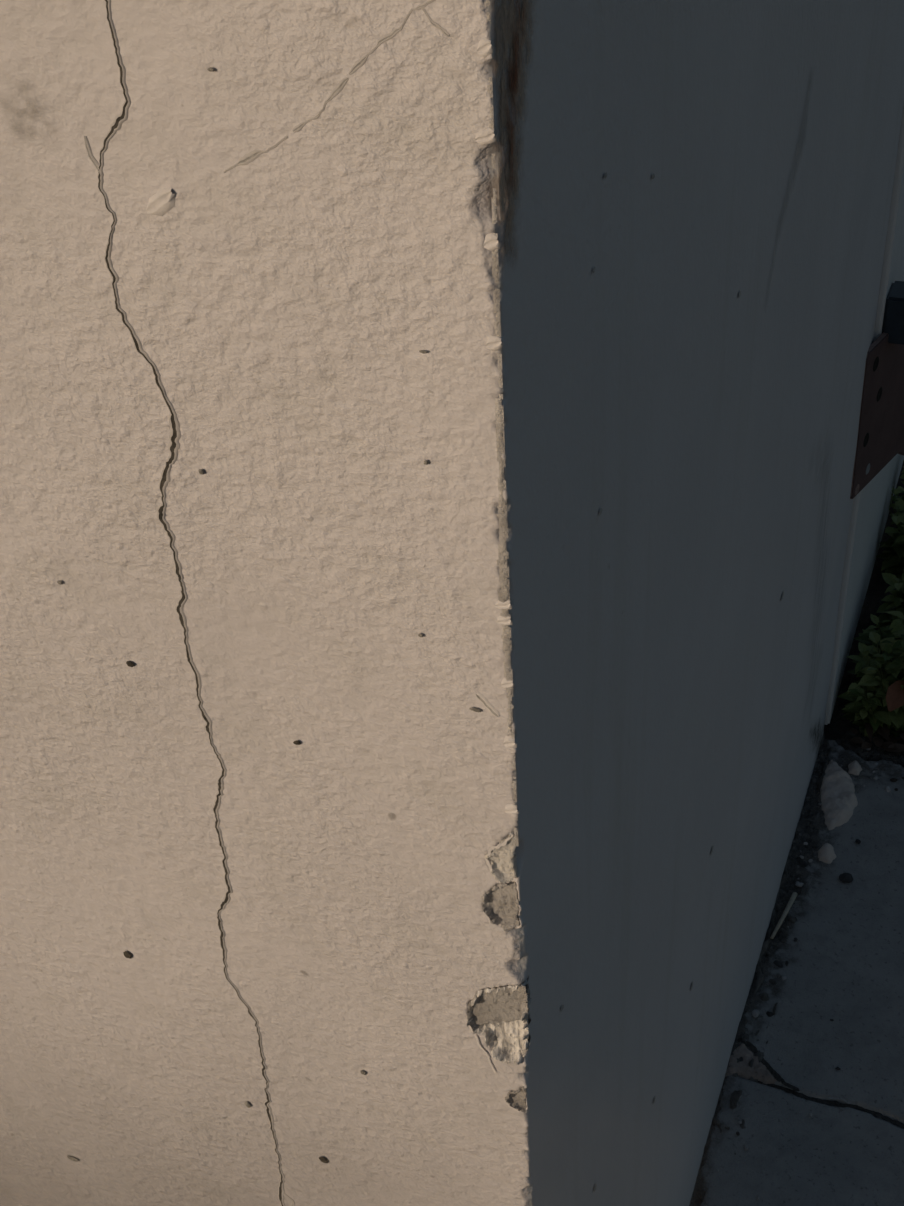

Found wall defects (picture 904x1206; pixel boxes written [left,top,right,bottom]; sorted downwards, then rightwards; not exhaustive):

crack [224,0,449,173]
rust [495,0,532,254]
crack [84,0,295,1206]
spalling [466,979,531,1073]
spalling [505,1087,527,1113]